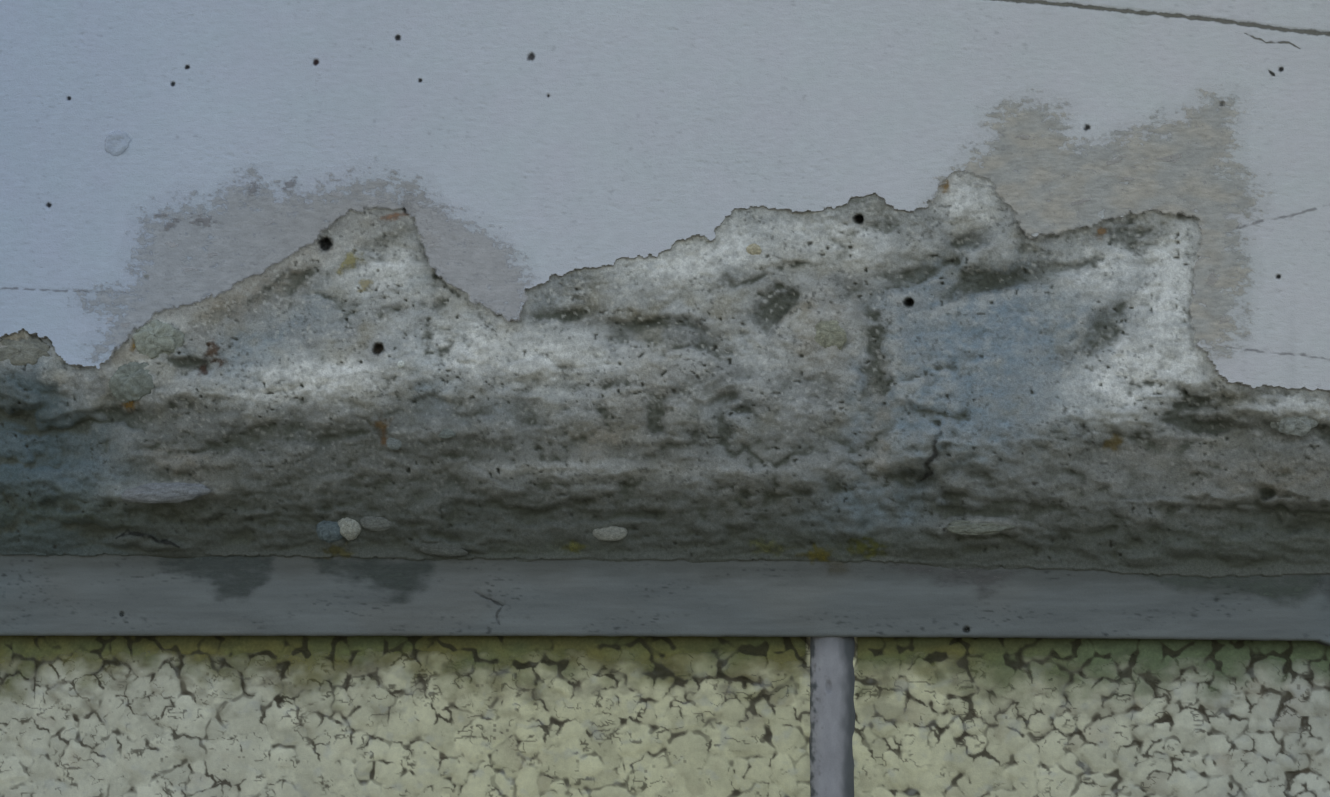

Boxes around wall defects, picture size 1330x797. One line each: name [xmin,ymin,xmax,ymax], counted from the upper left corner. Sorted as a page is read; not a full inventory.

crack [999,0,1330,76]
spalling [0,89,1330,579]